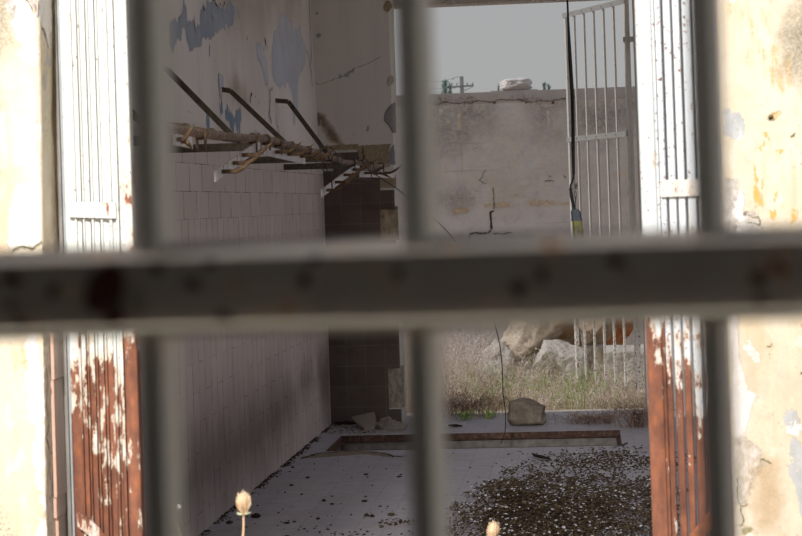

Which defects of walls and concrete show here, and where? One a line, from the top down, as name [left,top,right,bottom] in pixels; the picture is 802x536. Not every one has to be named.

peeling [5,0,52,91]
peeling [170,0,240,57]
peeling [265,13,307,124]
peeling [384,102,396,133]
crack [435,97,575,105]
peeling [319,144,396,169]
peeling [7,172,42,249]
crack [469,171,511,235]
rust [84,263,126,326]
peeling [733,321,761,438]
peeling [24,340,59,536]
peeling [783,409,802,516]